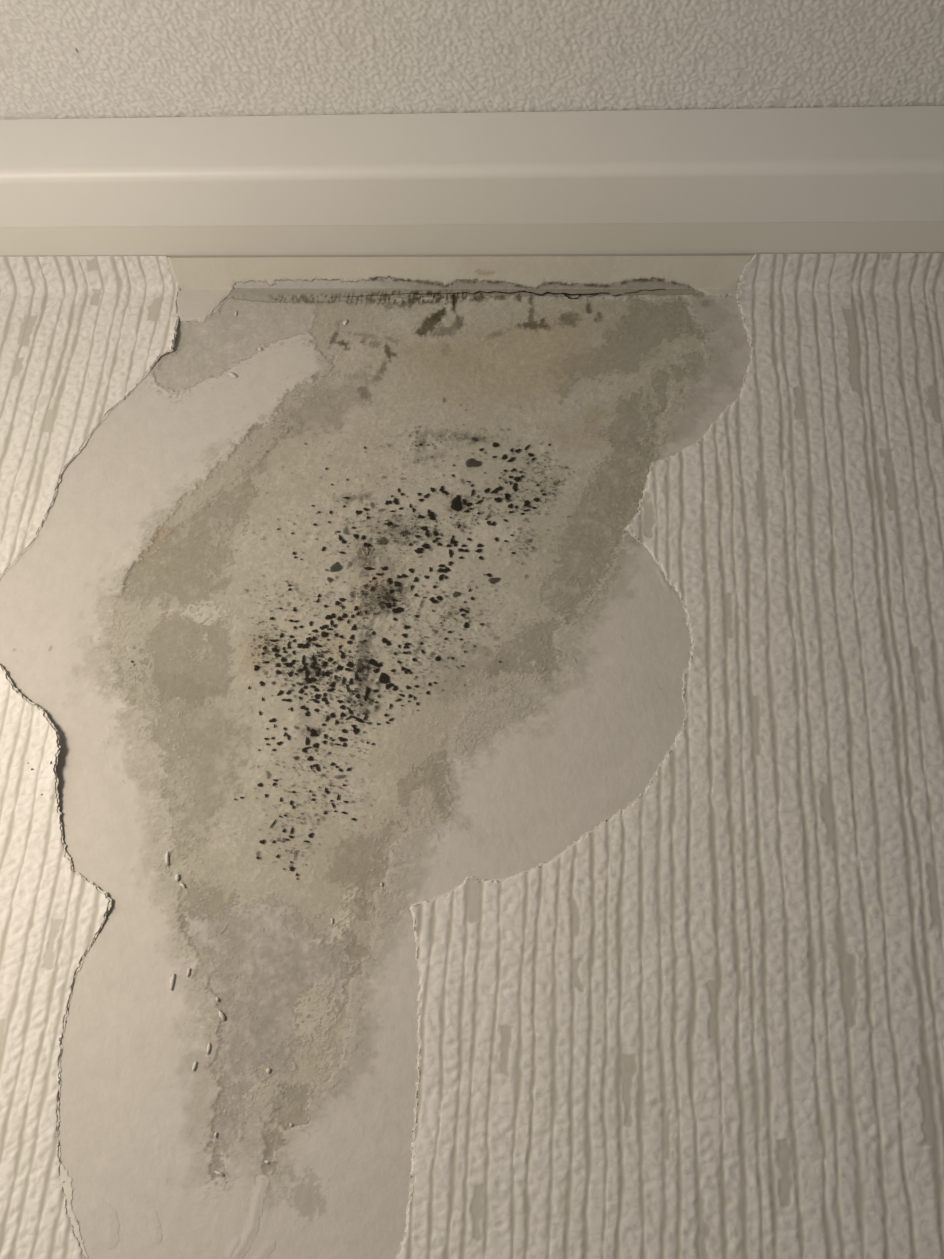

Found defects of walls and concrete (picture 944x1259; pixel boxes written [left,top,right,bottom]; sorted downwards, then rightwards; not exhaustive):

peeling [0,281,692,1259]
damp [99,278,710,1189]
peeling [392,280,751,460]